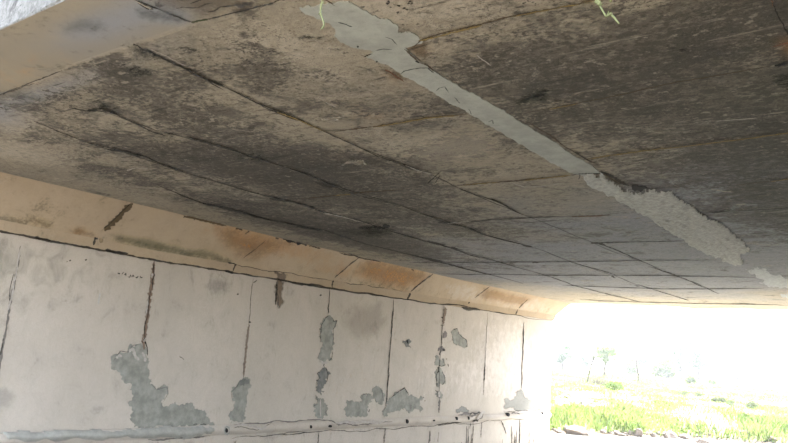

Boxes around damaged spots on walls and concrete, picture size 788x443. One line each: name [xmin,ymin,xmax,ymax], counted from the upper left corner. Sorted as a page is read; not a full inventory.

crack [133,0,593,183]
crack [420,66,788,247]
crack [198,169,398,234]
peeling [111,343,215,428]
peeling [229,377,252,423]
peeling [313,315,337,419]
crack [0,203,767,443]
peeling [344,386,424,418]
peeling [434,328,468,399]